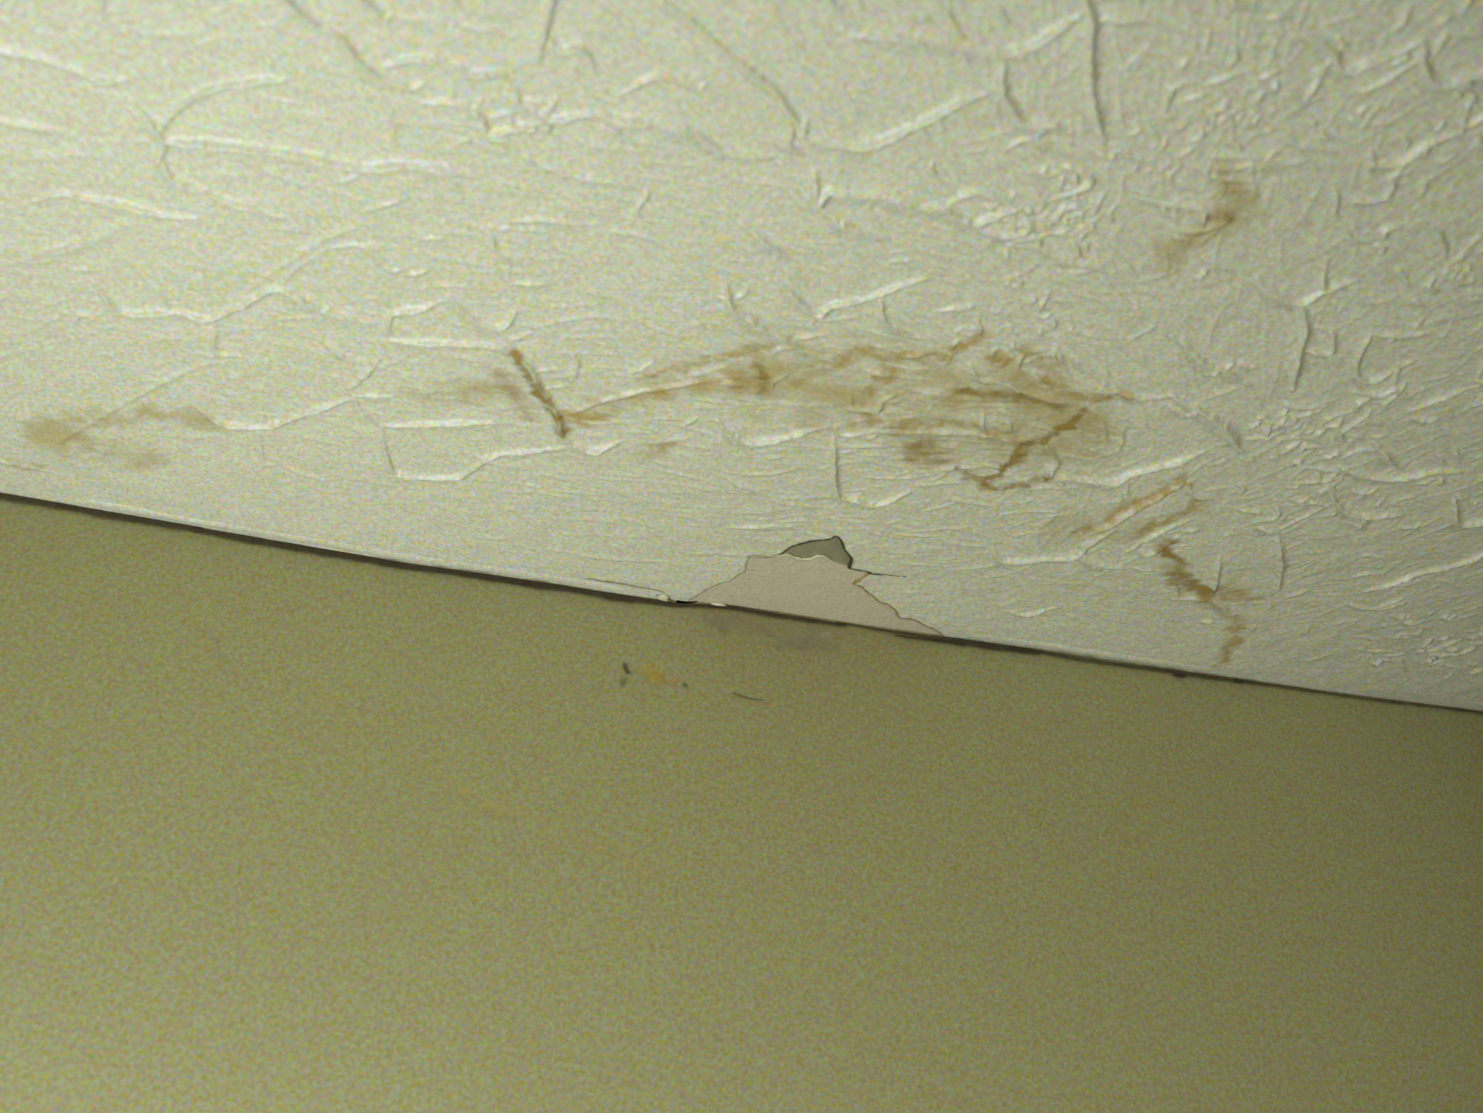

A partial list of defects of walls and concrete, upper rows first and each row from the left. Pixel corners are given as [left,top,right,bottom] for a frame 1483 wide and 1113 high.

leakage [510,350,603,438]
leakage [981,396,1111,490]
peeling [656,536,943,636]